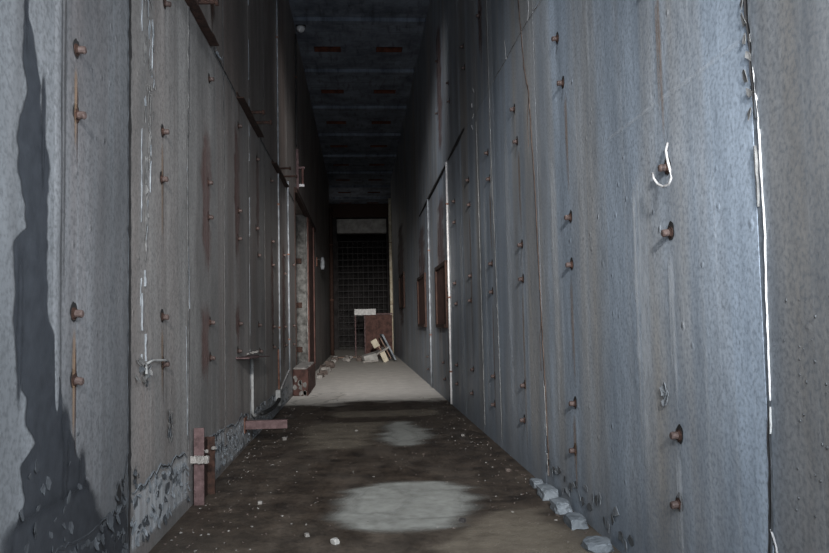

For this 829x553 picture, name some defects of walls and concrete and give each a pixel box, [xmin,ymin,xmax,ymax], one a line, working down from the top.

peeling [209,386,289,474]
peeling [49,452,191,553]